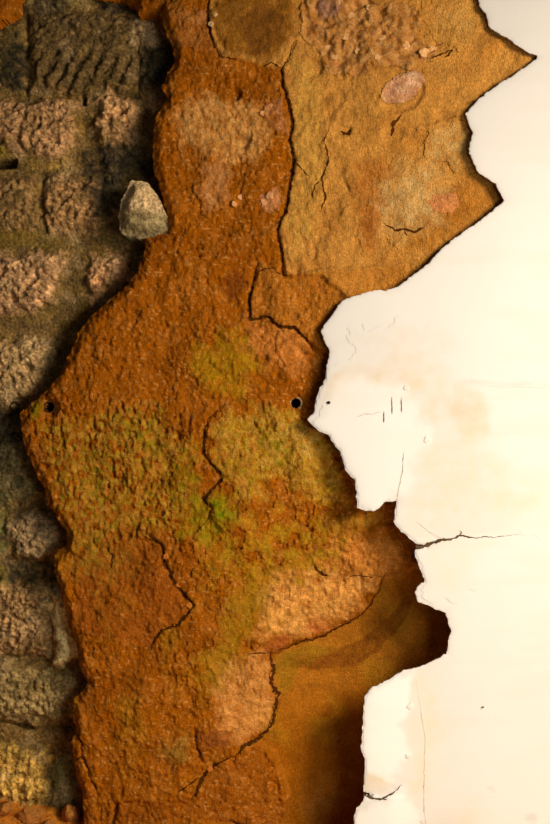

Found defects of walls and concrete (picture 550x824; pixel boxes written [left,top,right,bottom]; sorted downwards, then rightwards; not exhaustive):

spalling [194,6,218,27]
spalling [300,0,437,104]
spalling [258,186,282,214]
crack [247,43,351,352]
crack [196,410,223,533]
peeling [312,371,439,510]
spalling [69,524,193,649]
crack [145,534,195,650]
crack [415,521,511,549]
crack [179,564,385,800]
crack [363,785,401,800]
peeling [355,670,429,824]